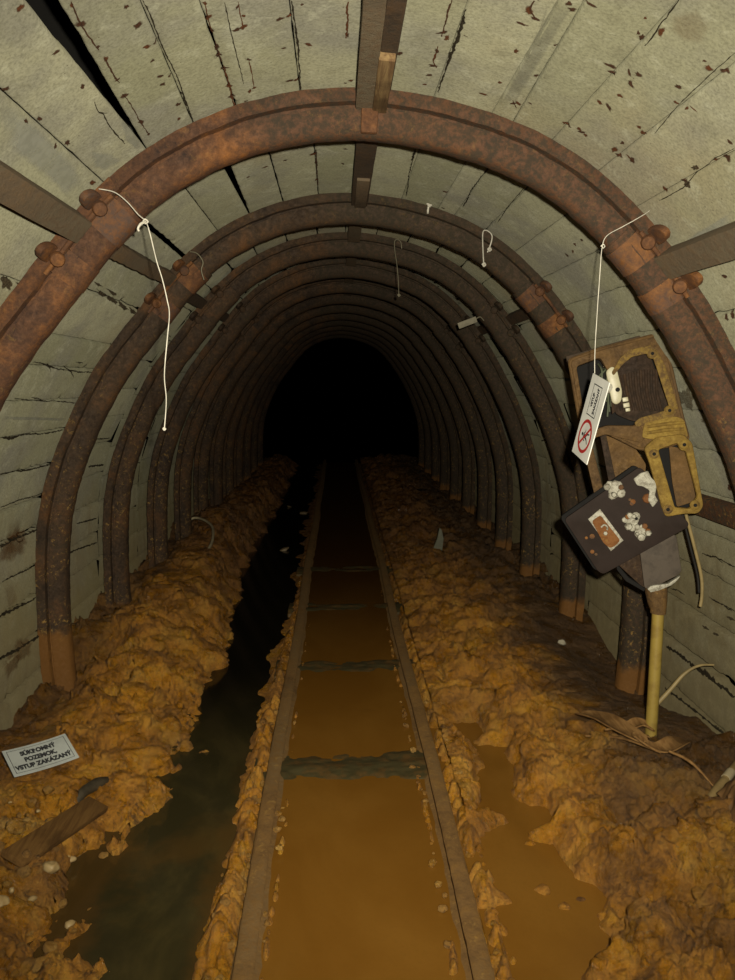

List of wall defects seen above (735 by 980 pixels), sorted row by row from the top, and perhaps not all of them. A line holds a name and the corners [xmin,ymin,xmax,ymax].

corrosion [70,1,150,135]
corrosion [203,2,256,106]
crack [224,2,244,84]
crack [438,9,466,92]
crack [645,0,679,46]
crack [94,102,125,144]
crack [659,148,734,201]
crack [35,362,92,377]
crack [0,429,62,440]
crack [2,464,50,507]
crack [0,597,36,617]
crack [666,646,735,698]